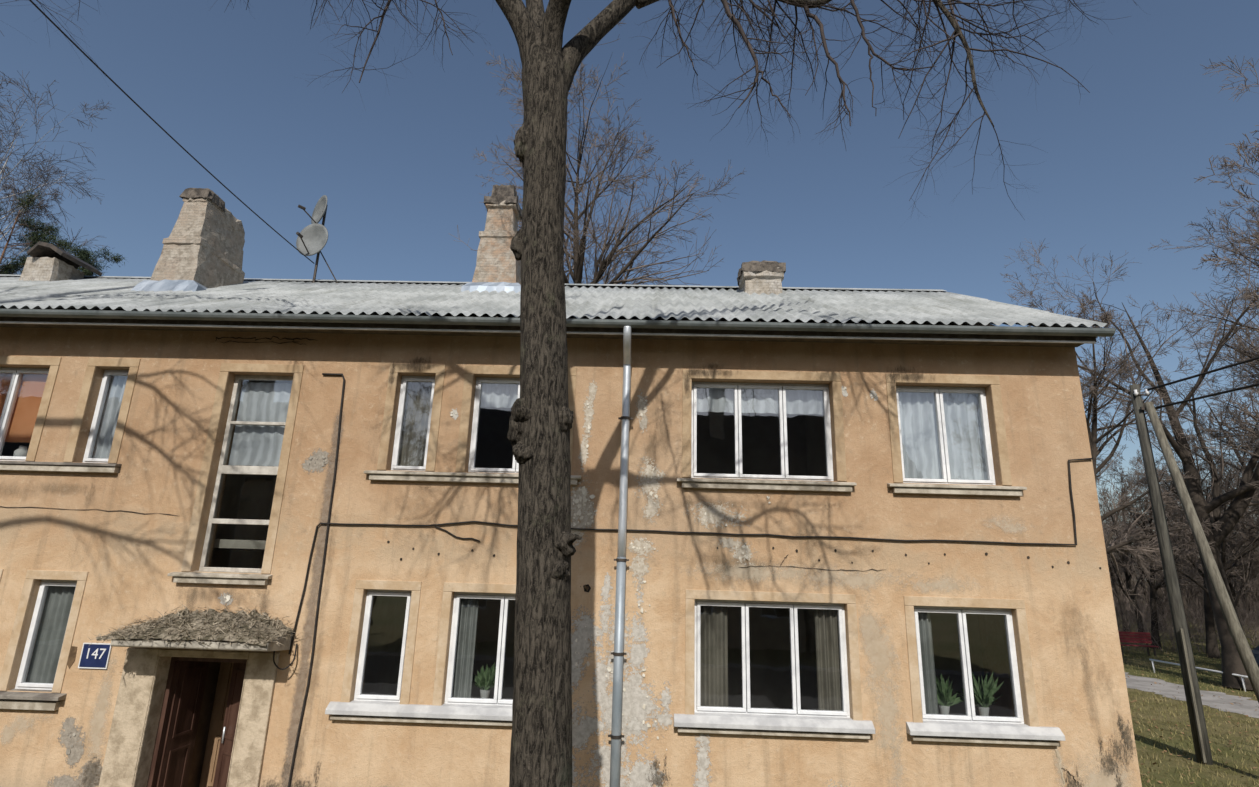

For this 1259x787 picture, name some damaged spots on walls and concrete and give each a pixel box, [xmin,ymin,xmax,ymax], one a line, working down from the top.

peeling [634,386,648,432]
peeling [571,380,598,549]
crack [0,506,178,516]
peeling [684,502,757,565]
peeling [571,456,673,787]
flaking render [46,716,103,787]
damp [1098,715,1134,787]